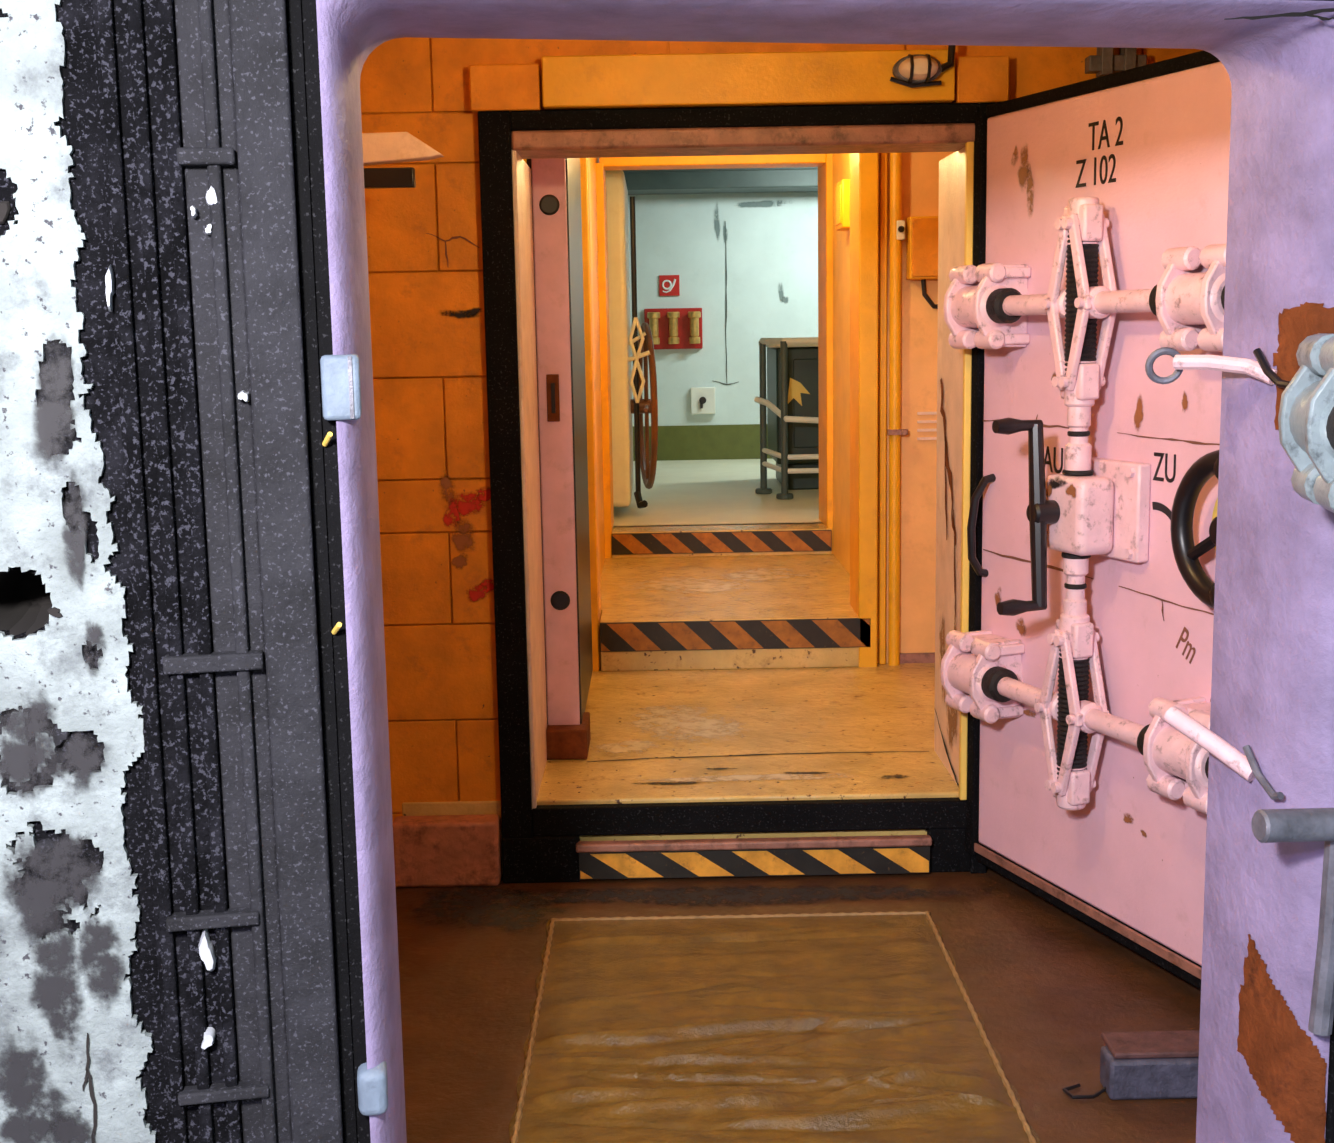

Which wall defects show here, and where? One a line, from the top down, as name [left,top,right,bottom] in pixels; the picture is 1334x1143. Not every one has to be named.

corrosion [1013,147,1033,212]
water stain [34,346,73,460]
corrosion [1273,302,1334,430]
water stain [62,491,86,585]
hole [0,569,63,639]
water stain [85,626,104,674]
water stain [0,698,103,794]
water stain [6,835,124,1044]
corrosion [1237,934,1327,1143]
water stain [0,1045,93,1143]